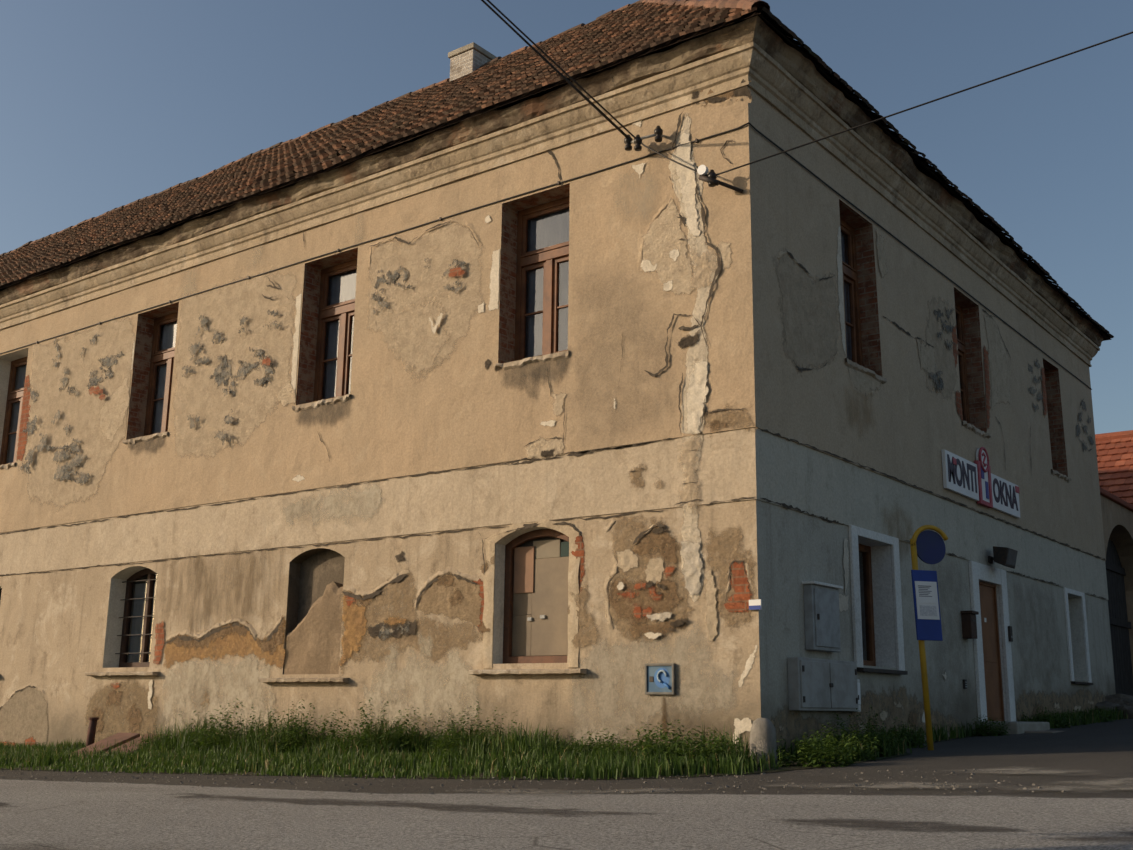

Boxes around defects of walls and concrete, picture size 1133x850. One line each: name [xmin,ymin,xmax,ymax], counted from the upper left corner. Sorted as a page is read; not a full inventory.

spalling [16,317,135,511]
spalling [173,273,302,457]
crack [0,108,843,602]
peeling [367,215,500,379]
peeling [636,196,695,295]
peeling [836,226,846,354]
spalling [926,298,963,421]
peeling [339,533,494,730]
spalling [500,516,757,747]